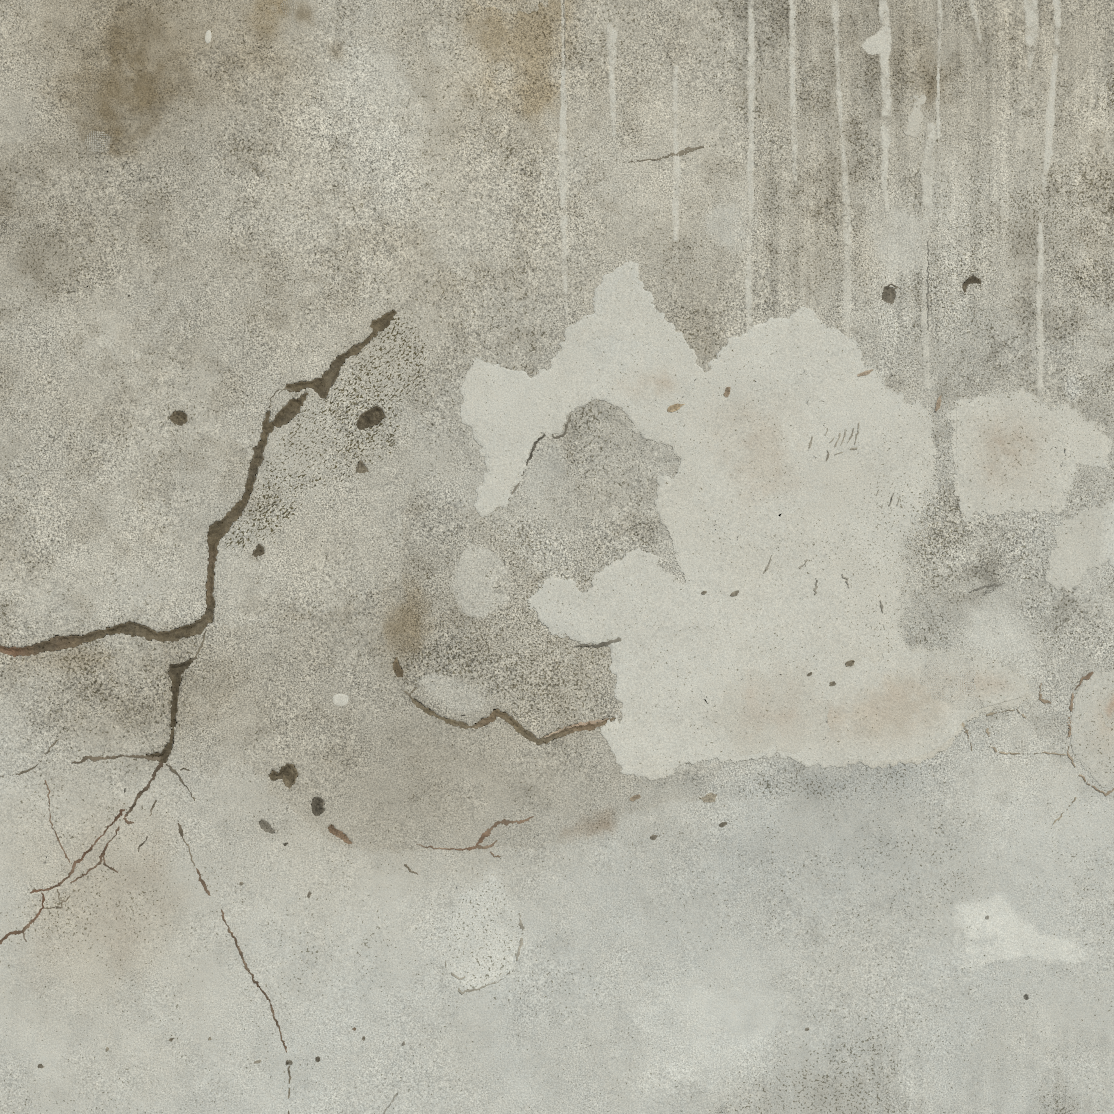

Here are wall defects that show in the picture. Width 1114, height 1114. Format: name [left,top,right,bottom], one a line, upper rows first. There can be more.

water stain [898,35,956,117]
crack [628,146,704,163]
flaking render [460,259,1114,781]
flaking render [446,539,515,623]
crack [0,310,397,944]
crack [574,637,621,647]
crack [404,687,615,745]
crack [962,672,1114,825]
crack [404,816,534,874]
crack [177,823,292,1114]